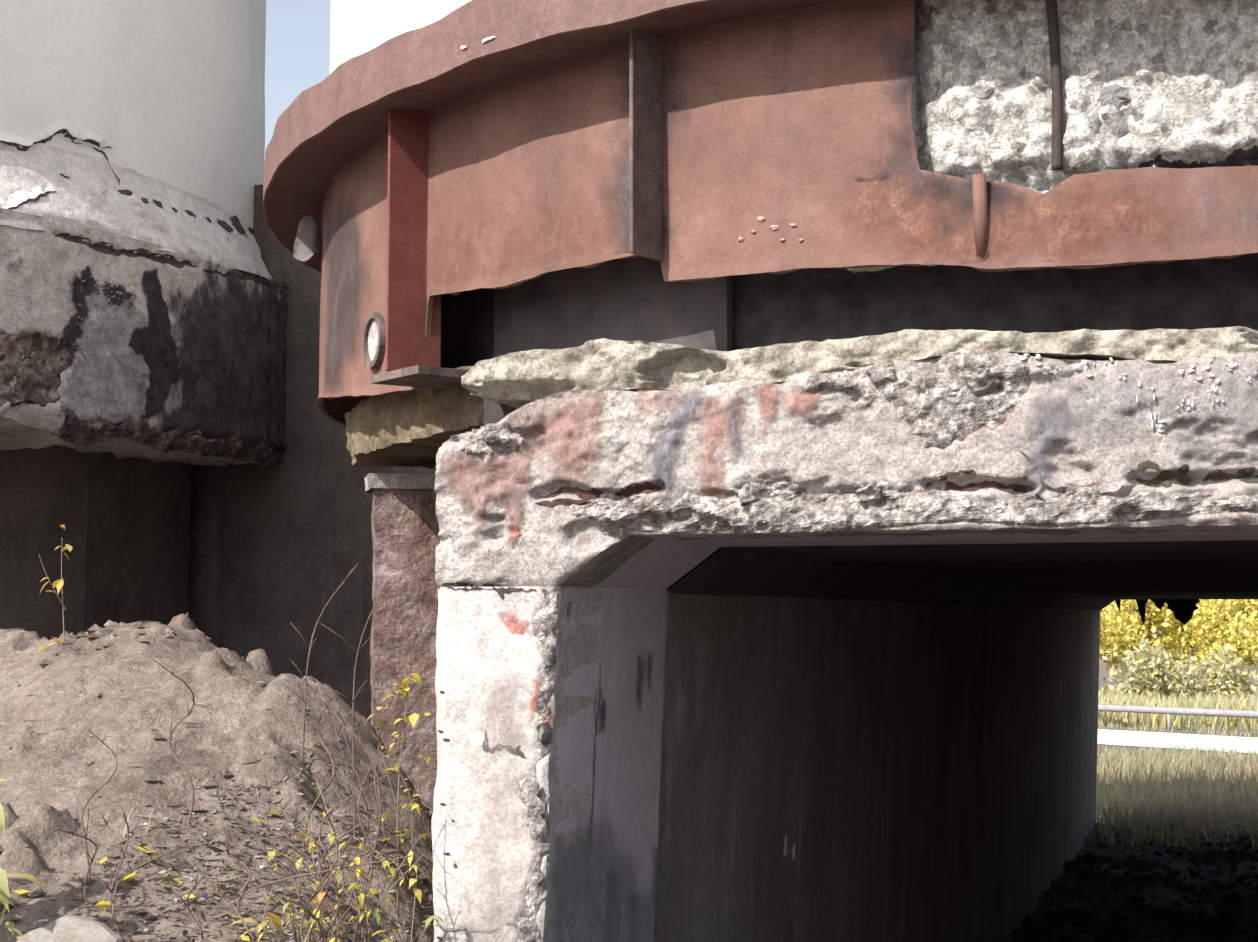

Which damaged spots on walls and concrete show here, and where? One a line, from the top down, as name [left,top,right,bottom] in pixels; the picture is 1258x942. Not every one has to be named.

spalling [912,0,1258,194]
spalling [55,233,288,289]
rust [738,216,803,242]
spalling [0,330,286,466]
spalling [793,348,1032,449]
spalling [570,477,1258,541]
spalling [516,589,572,942]